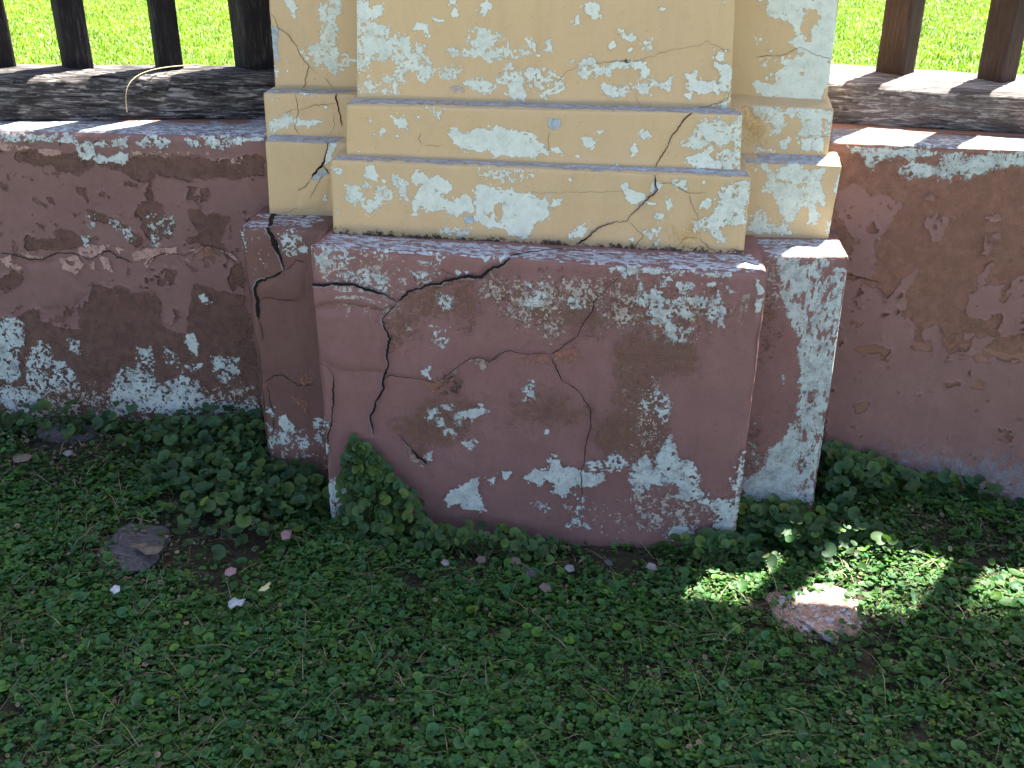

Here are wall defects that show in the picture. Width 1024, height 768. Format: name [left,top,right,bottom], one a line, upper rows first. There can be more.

crack [251,13,729,494]
peeling [0,0,1024,553]